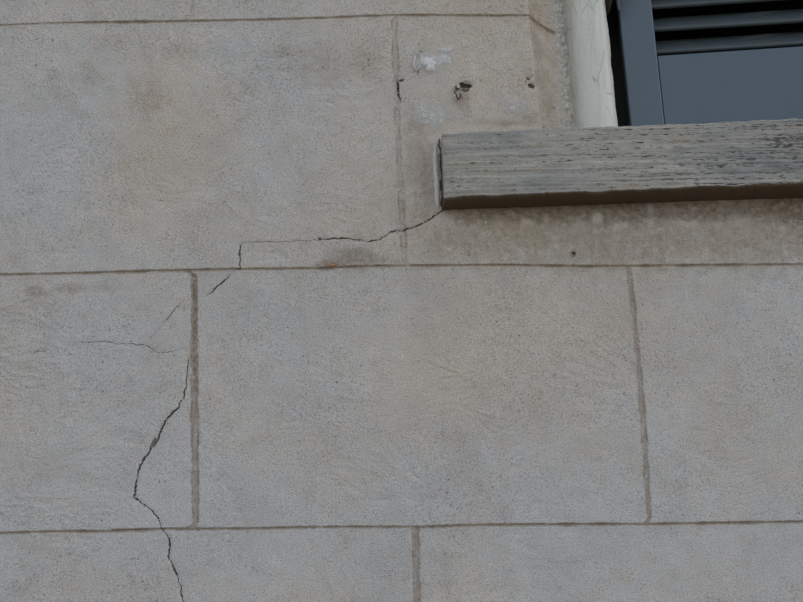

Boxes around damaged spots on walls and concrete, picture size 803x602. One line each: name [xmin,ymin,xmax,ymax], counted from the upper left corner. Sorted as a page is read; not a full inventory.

crack [209,138,444,294]
crack [77,305,189,602]